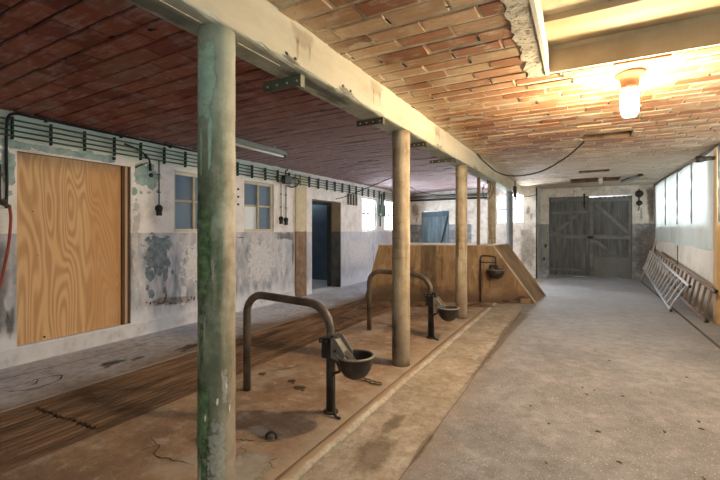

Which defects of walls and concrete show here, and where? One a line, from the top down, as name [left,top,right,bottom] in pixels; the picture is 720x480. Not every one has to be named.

peeling [132,163,195,305]
peeling [216,368,231,412]
crack [142,438,193,465]
peeling [198,415,227,480]